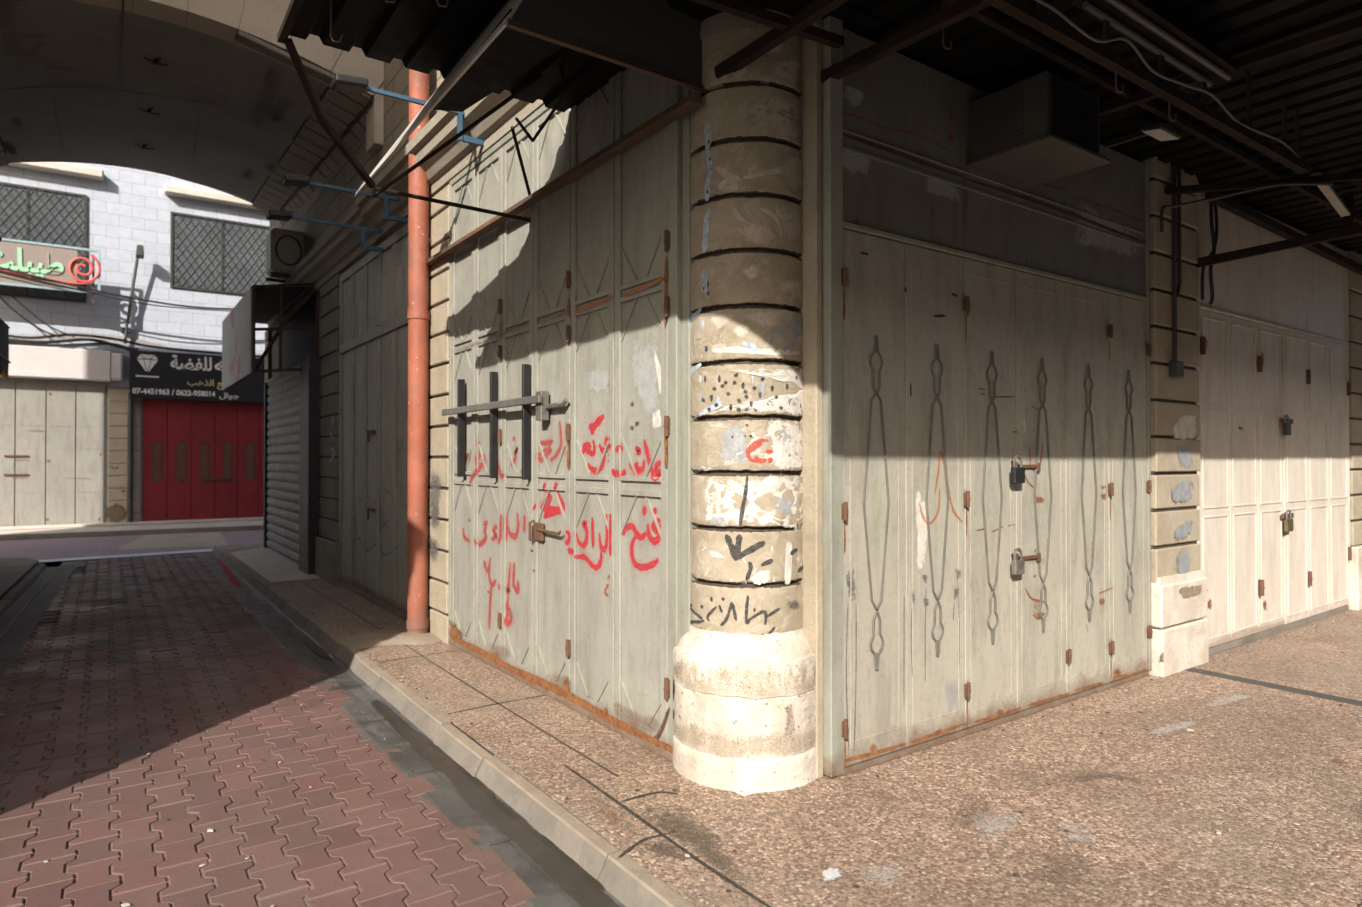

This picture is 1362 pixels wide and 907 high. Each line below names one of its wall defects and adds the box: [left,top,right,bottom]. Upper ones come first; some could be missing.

peeling [693,278,803,585]
peeling [1172,414,1197,441]
rust [448,621,673,753]
rust [836,635,1149,777]